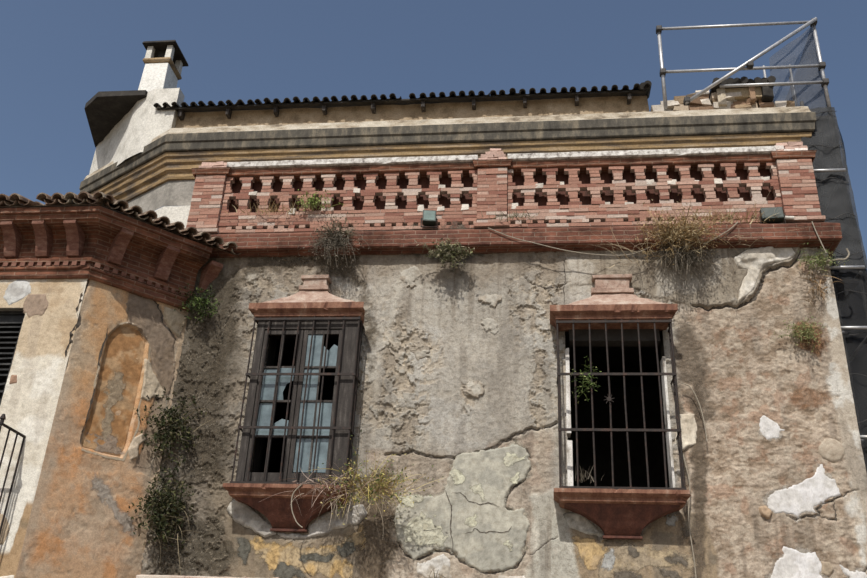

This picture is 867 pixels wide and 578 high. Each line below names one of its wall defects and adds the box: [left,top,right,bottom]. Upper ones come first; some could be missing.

peeling [693,246,801,312]
crack [65,280,89,357]
spalling [126,293,187,401]
peeling [128,433,147,460]
crack [389,450,455,460]
crack [485,423,557,458]
spalling [759,415,784,440]
spalling [758,464,856,522]
peeling [227,499,367,578]
spalling [417,554,452,578]
peeling [563,512,697,578]
spalling [765,546,867,578]